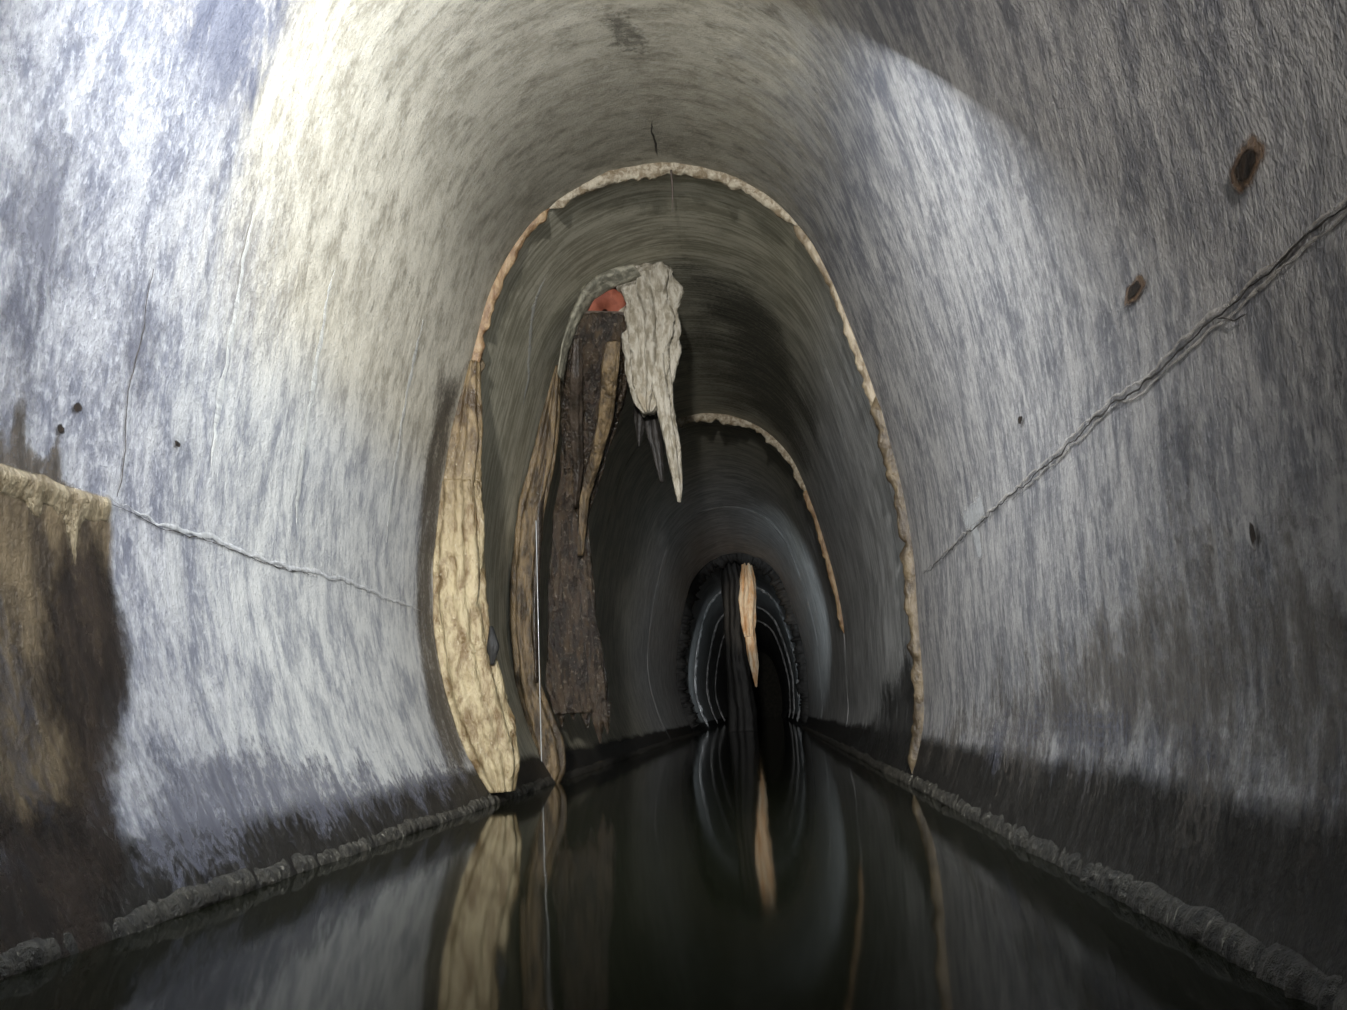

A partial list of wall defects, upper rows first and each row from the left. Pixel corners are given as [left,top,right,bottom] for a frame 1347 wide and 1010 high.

leakage [0,132,498,961]
crack [923,197,1347,573]